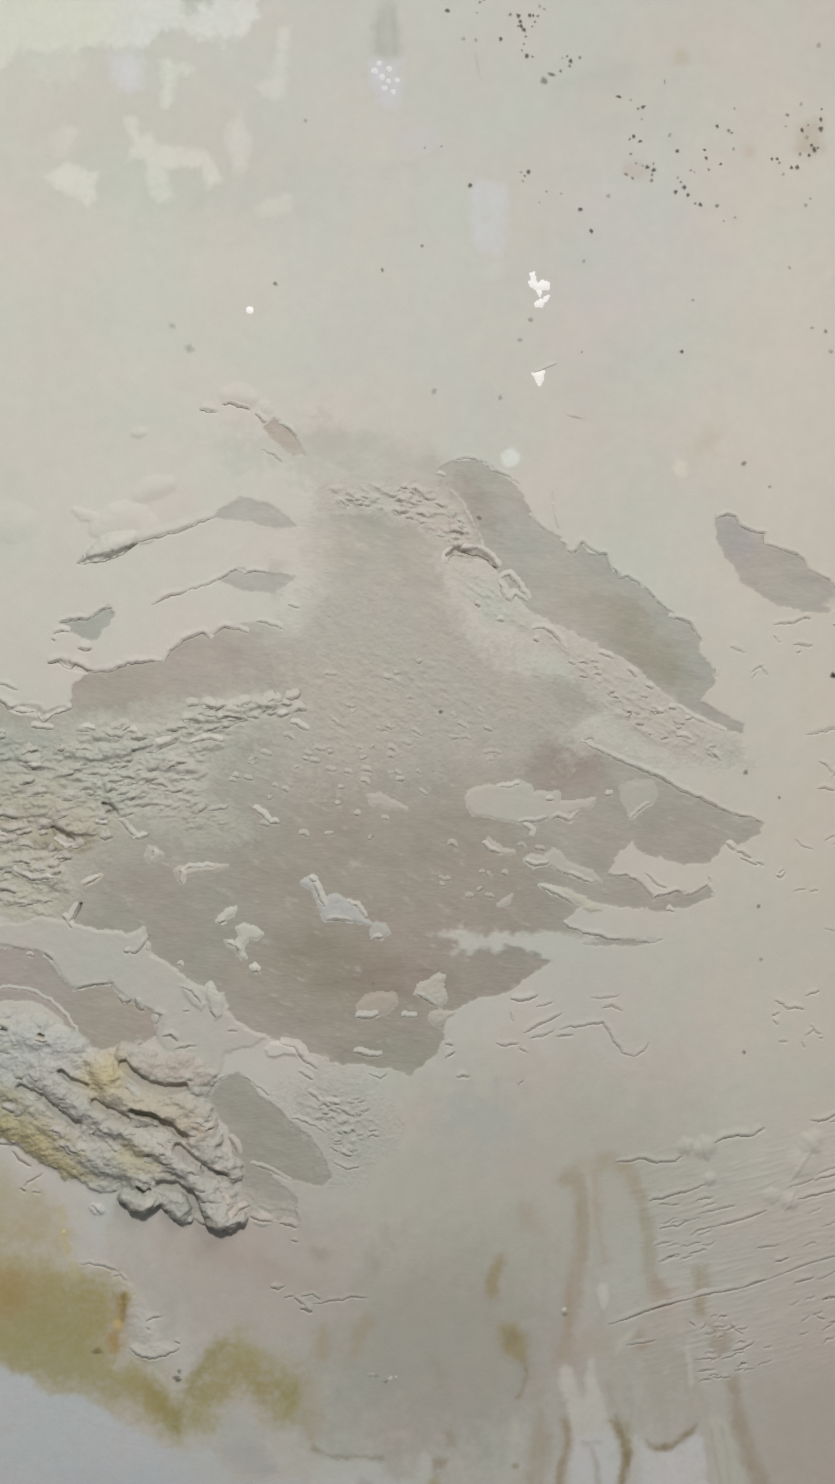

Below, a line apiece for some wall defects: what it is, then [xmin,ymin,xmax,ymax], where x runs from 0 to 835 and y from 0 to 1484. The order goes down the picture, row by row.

water stain [365,0,448,185]
water stain [508,3,546,59]
water stain [539,55,582,85]
water stain [615,95,830,222]
water stain [464,169,531,283]
peeling [199,399,304,462]
peeling [714,508,835,615]
peeling [0,453,767,1242]
crack [725,830,835,931]
crack [712,1123,763,1143]
crack [810,1108,835,1122]
crack [607,1150,835,1382]